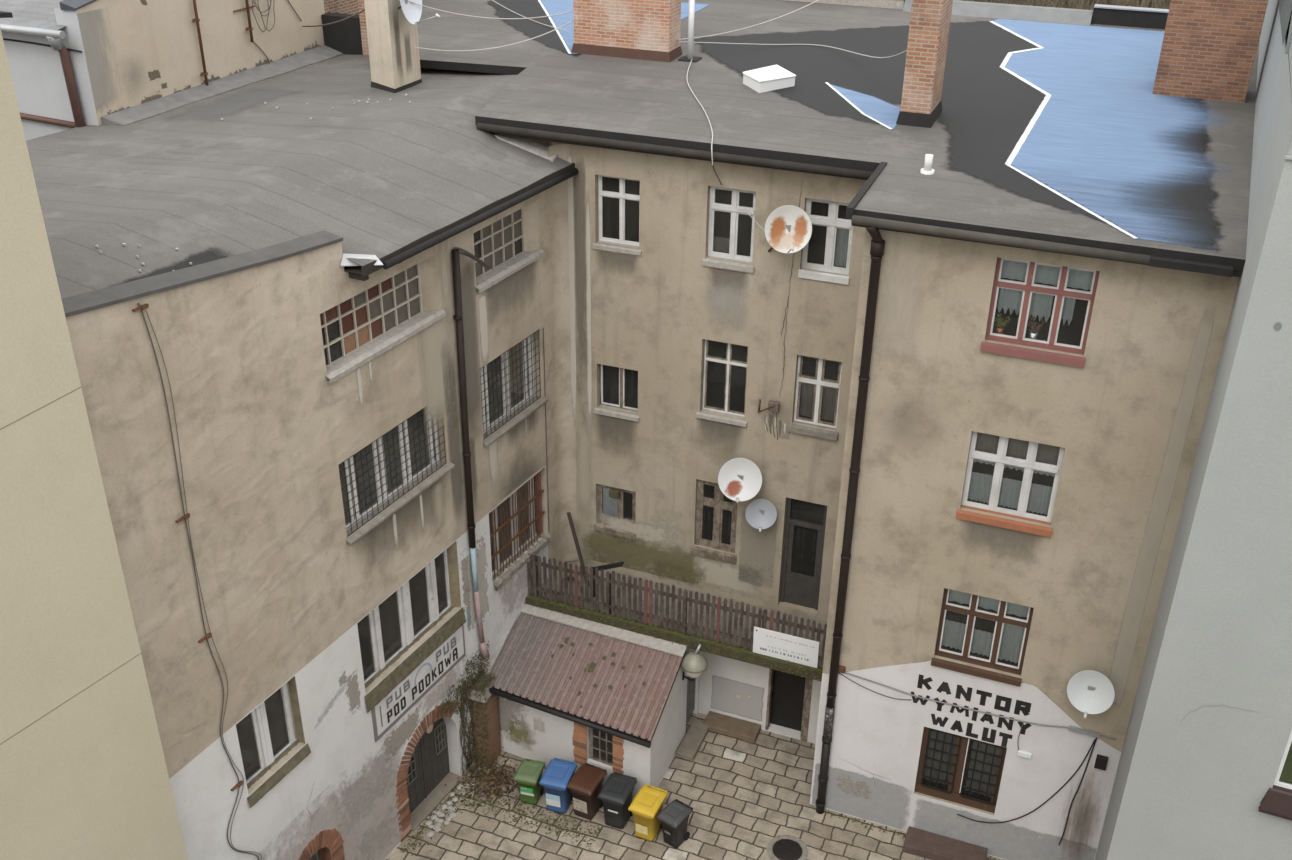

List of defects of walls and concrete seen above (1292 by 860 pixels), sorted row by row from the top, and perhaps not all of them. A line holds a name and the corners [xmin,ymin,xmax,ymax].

leakage [713,268,745,281]
leakage [567,156,635,507]
leakage [366,241,535,544]
leakage [703,419,739,433]
leakage [587,514,760,594]
peeling [278,671,456,860]
leakage [812,764,1096,860]